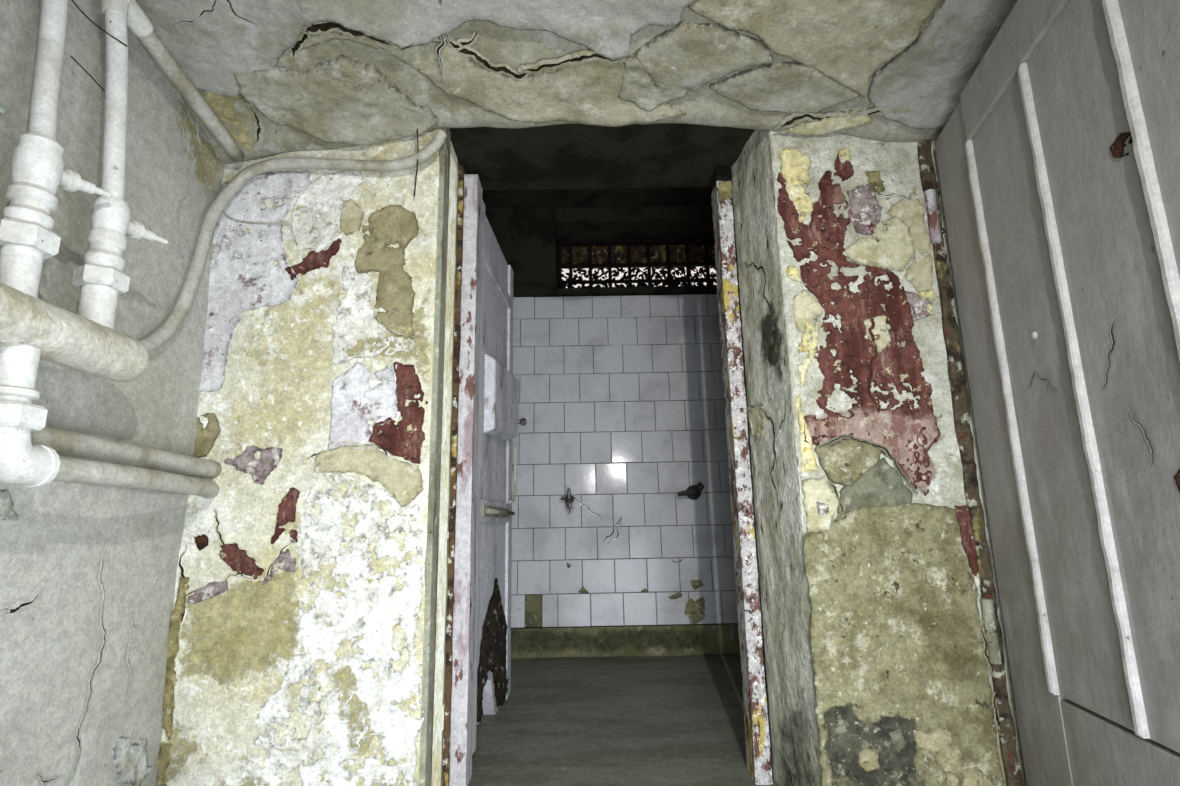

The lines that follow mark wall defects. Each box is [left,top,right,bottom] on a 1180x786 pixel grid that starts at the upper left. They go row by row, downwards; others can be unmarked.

crack [170,0,262,30]
crack [289,22,627,80]
peeling [135,0,1017,146]
crack [235,94,265,146]
peeling [1110,132,1133,158]
peeling [718,181,733,201]
peeling [747,403,765,439]
peeling [112,170,428,786]
peeling [777,148,1005,786]
crack [0,581,46,622]
peeling [524,594,542,627]
spalling [668,580,705,624]